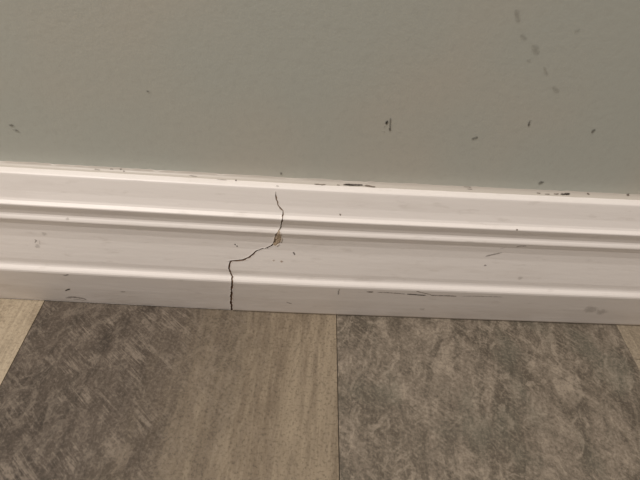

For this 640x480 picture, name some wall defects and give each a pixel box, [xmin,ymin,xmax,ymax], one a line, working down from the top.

crack [228,193,284,310]